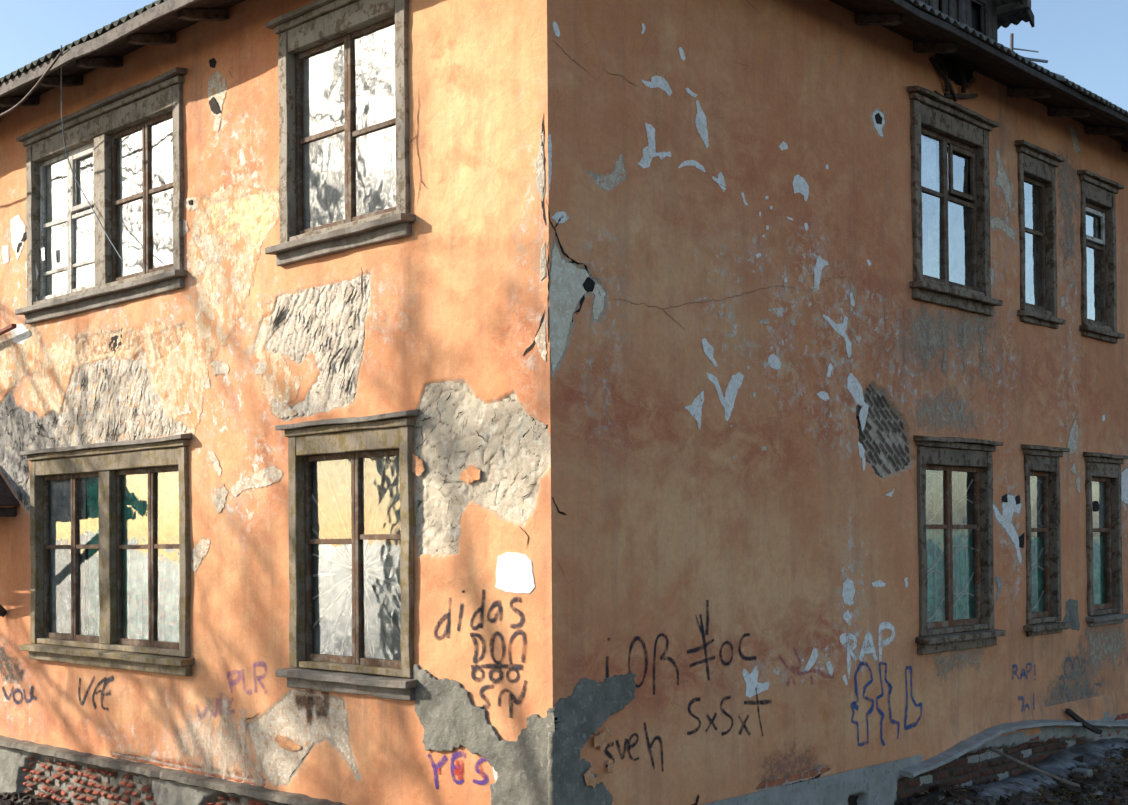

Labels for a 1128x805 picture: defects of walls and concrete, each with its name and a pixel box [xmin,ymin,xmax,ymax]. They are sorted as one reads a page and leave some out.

peeling [207,58,227,134]
peeling [589,123,726,192]
peeling [686,88,709,148]
crack [523,113,844,364]
peeling [0,183,371,513]
spalling [412,381,551,555]
spalling [535,242,606,372]
peeling [685,338,750,430]
spalling [847,373,910,478]
peeling [190,537,210,572]
peeling [993,494,1025,564]
peeling [22,690,359,805]